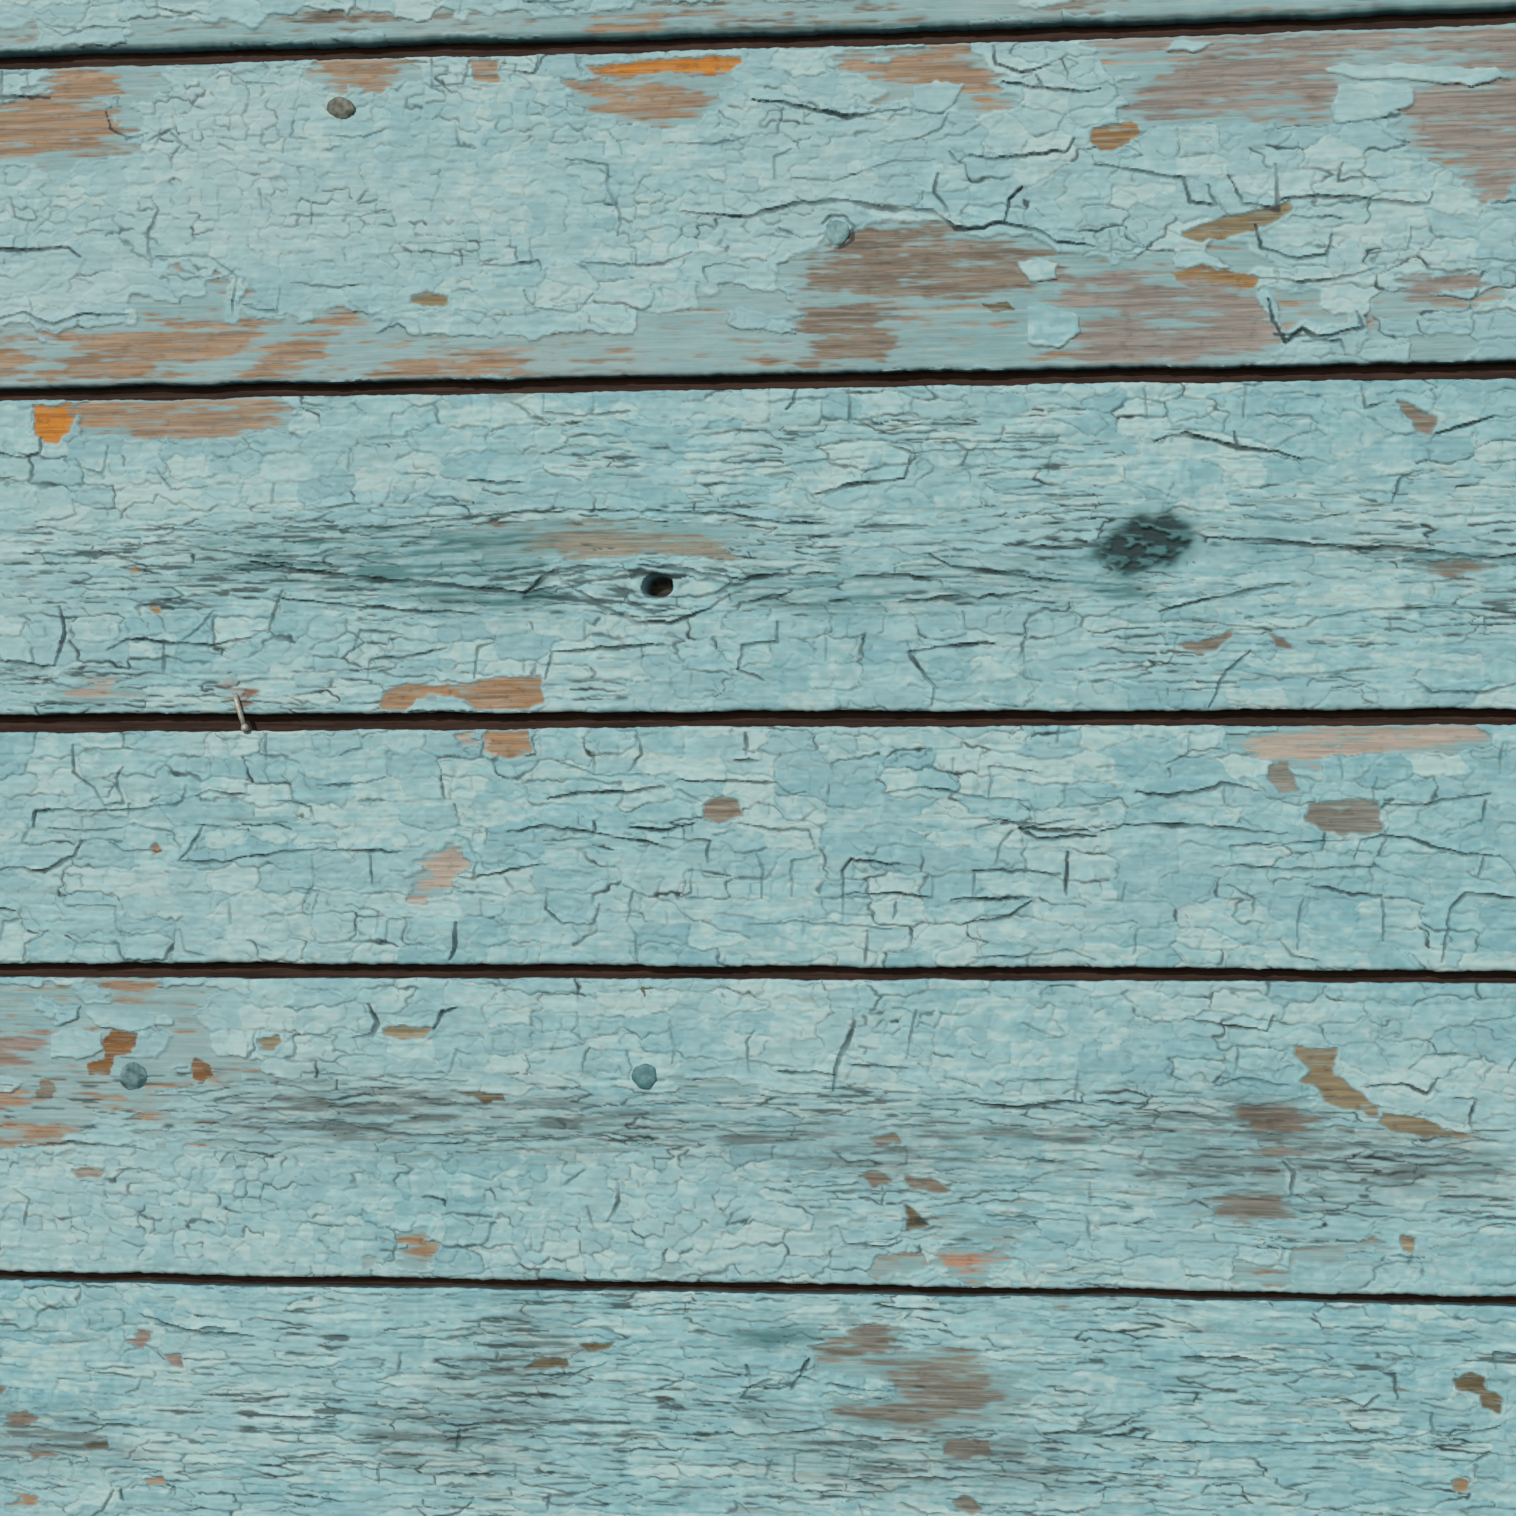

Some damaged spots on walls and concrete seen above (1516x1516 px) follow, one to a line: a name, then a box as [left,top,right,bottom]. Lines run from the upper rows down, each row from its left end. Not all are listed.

peeling [1171,193,1299,290]
peeling [1018,257,1058,282]
peeling [982,300,1081,349]